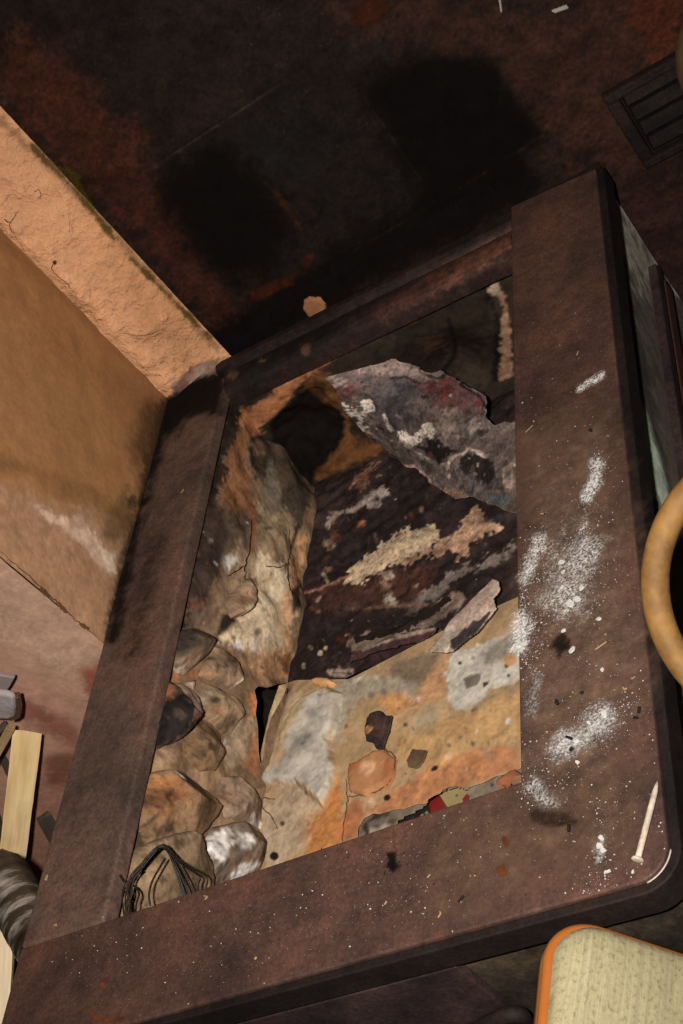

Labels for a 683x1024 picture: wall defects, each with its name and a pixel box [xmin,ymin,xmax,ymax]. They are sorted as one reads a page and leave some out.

damp [31,144,114,239]
damp [130,258,212,339]
rust [350,627,438,663]